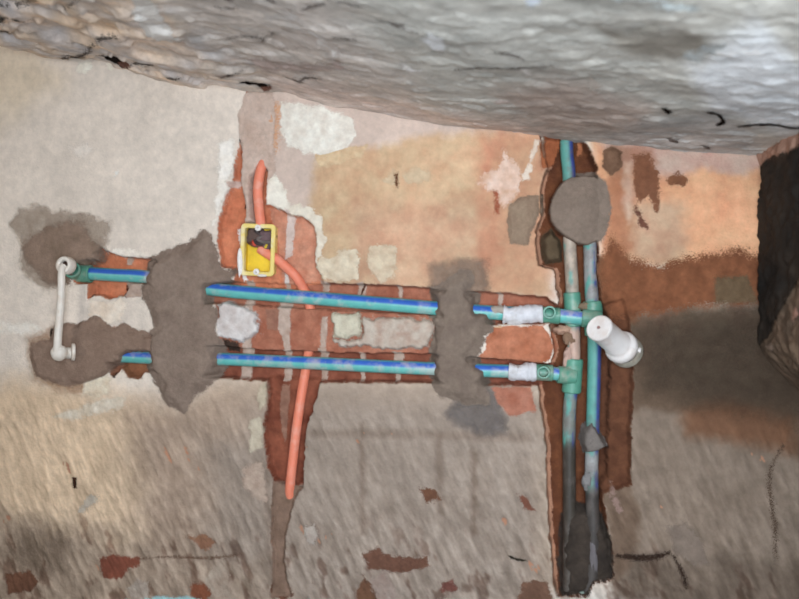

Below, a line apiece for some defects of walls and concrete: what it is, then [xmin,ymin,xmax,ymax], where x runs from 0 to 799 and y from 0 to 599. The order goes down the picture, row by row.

crack [287,76,321,84]
crack [706,112,799,130]
flaking render [210,138,433,301]
flaking render [211,296,436,362]
flaking render [479,320,567,367]
flaking render [219,366,434,503]
flaking render [576,326,588,506]
flaking render [598,347,635,531]
flaking render [486,377,615,599]
flaking render [98,554,234,599]
flaking render [355,547,430,599]
crack [614,550,689,589]